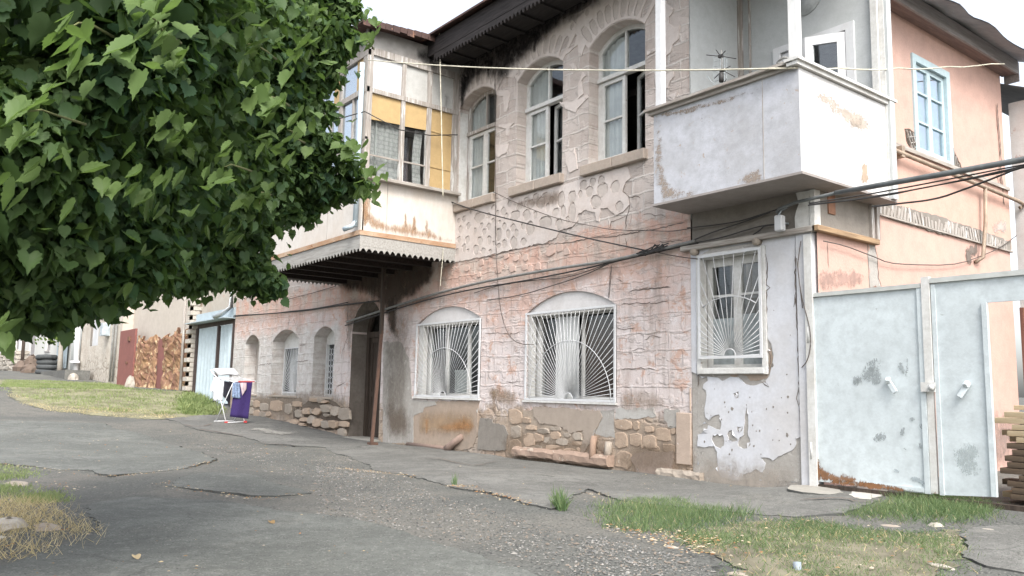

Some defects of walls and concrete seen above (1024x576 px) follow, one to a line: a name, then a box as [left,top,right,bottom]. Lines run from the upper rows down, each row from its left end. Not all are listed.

peeling [817,94,870,130]
peeling [655,131,692,198]
peeling [698,388,802,483]
corrosion [818,459,904,491]